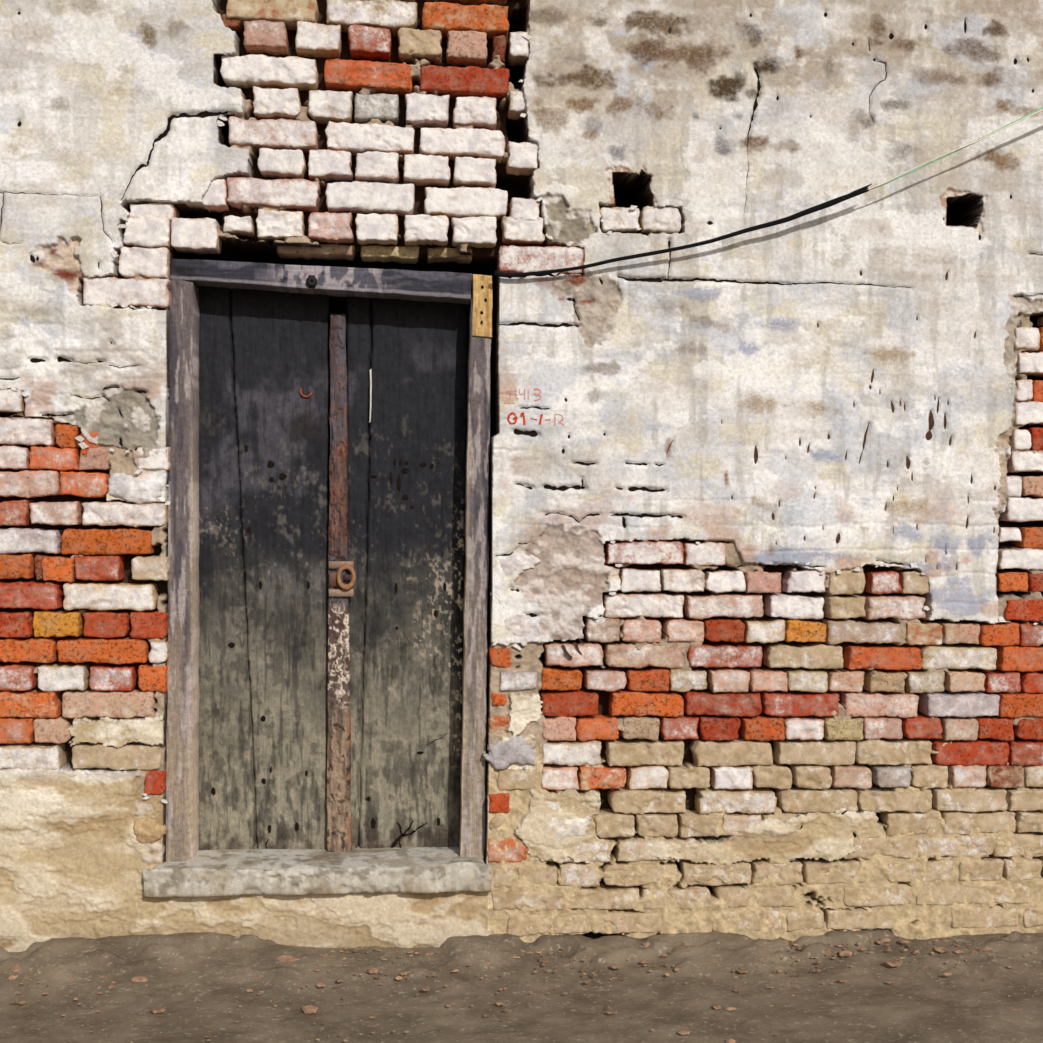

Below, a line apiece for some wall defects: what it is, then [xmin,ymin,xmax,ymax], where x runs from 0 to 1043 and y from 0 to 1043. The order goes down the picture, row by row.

crack [0,111,235,268]
flaking render [77,0,585,310]
water stain [536,65,613,110]
water stain [626,12,712,70]
water stain [710,75,756,101]
crack [745,66,761,206]
water stain [948,21,1005,60]
crack [617,241,910,288]
crack [0,341,147,451]
flaking render [926,395,952,446]
flaking render [0,386,171,803]
flaking render [485,538,1043,943]